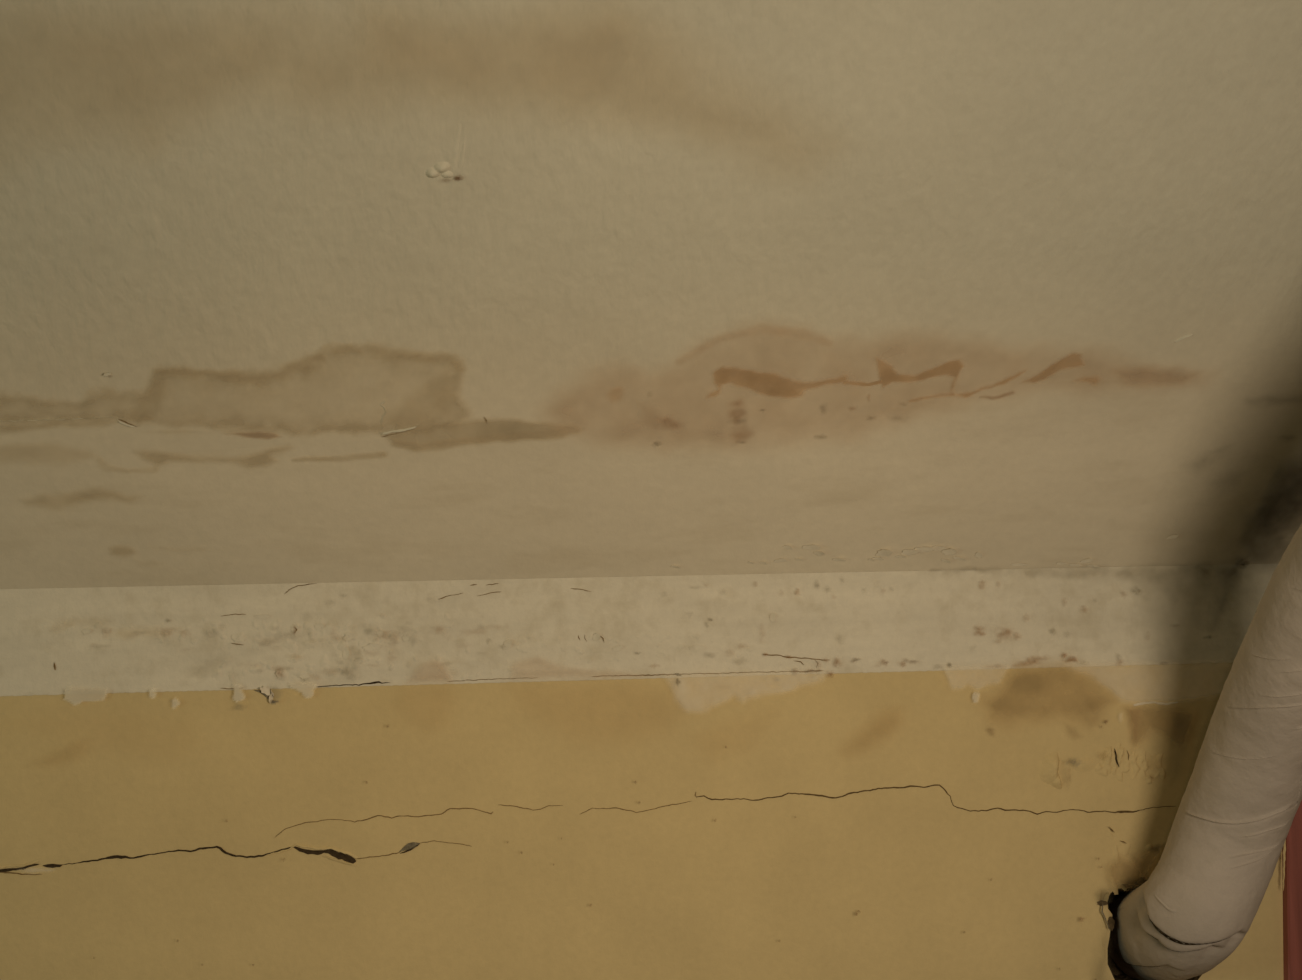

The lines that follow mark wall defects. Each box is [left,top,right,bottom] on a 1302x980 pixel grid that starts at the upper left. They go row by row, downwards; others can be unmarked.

water stain [712,361,962,397]
water stain [475,422,570,442]
crack [0,784,1175,875]
flaking render [1094,827,1158,963]